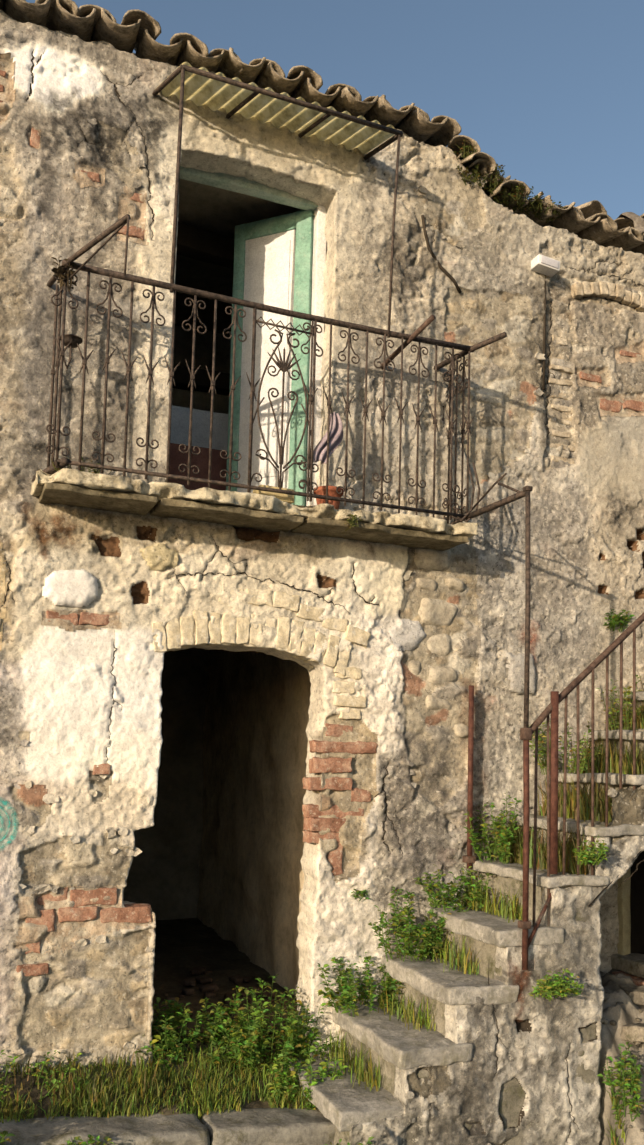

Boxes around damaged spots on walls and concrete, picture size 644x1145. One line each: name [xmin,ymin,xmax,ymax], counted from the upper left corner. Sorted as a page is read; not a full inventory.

crack [26,50,45,102]
crack [77,72,155,241]
flaking render [575,340,644,417]
crack [149,537,380,612]
crack [106,631,122,764]
flaking render [302,714,379,883]
peeling [10,781,155,1055]
spalling [466,1078,526,1145]